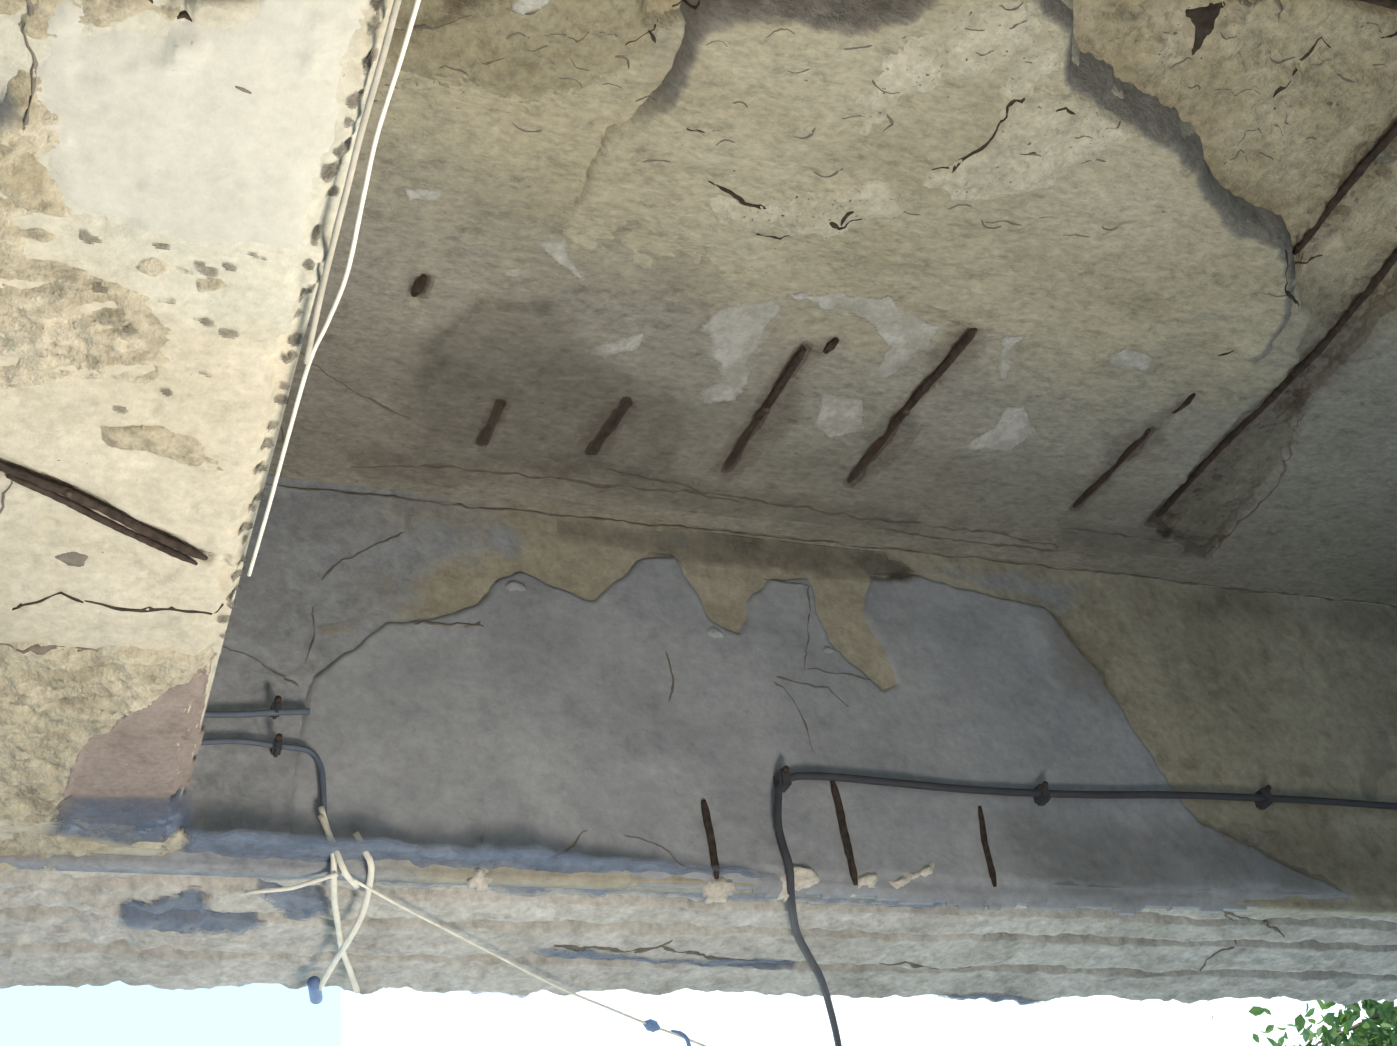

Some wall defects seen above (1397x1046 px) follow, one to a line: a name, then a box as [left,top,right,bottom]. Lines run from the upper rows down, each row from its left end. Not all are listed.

crack [22,0,39,131]
peeling [364,0,681,112]
spalling [322,92,362,196]
peeling [709,180,905,240]
spalling [847,0,1397,554]
crack [0,481,13,514]
crack [0,643,98,655]
crack [12,591,224,615]
spalling [0,489,265,874]
spalling [701,799,736,905]
spalling [830,781,935,897]
spalling [978,806,997,887]